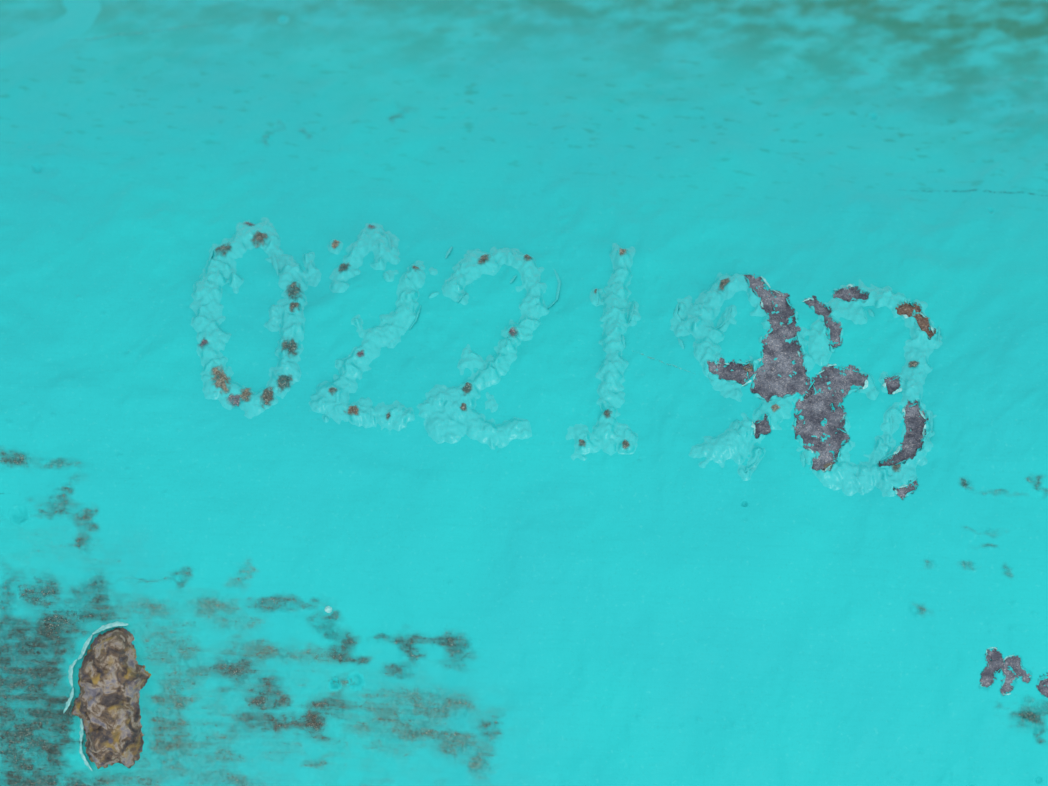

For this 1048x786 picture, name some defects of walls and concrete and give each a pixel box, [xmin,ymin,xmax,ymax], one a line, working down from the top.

rust [245,222,267,247]
rust [288,282,300,312]
peeling [896,301,940,341]
rust [282,339,297,355]
rust [212,367,292,406]
peeling [707,274,869,473]
peeling [877,376,929,469]
peeling [893,476,918,500]
rust [332,636,367,663]
rust [0,582,108,786]
peeling [980,647,1048,699]
rust [248,678,345,739]